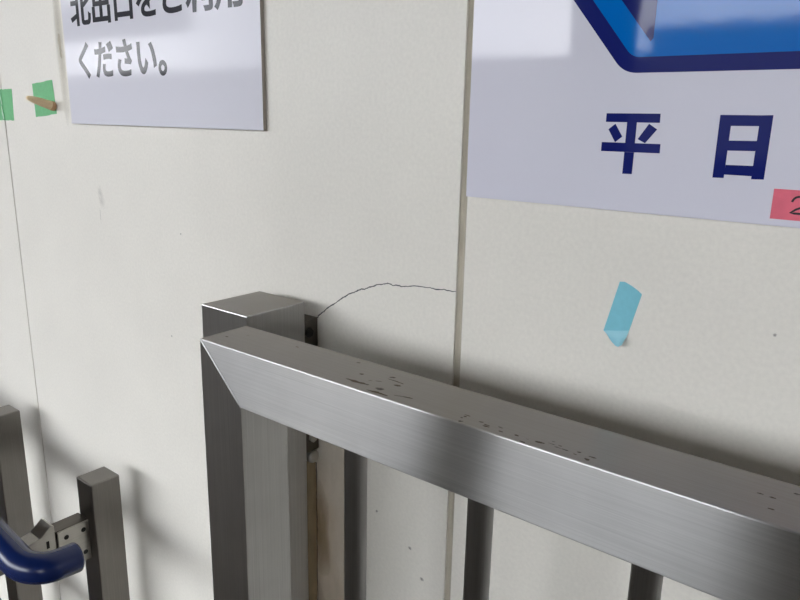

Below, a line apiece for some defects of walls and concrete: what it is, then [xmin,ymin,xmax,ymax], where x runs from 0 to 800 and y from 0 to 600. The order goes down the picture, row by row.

crack [317,283,456,318]